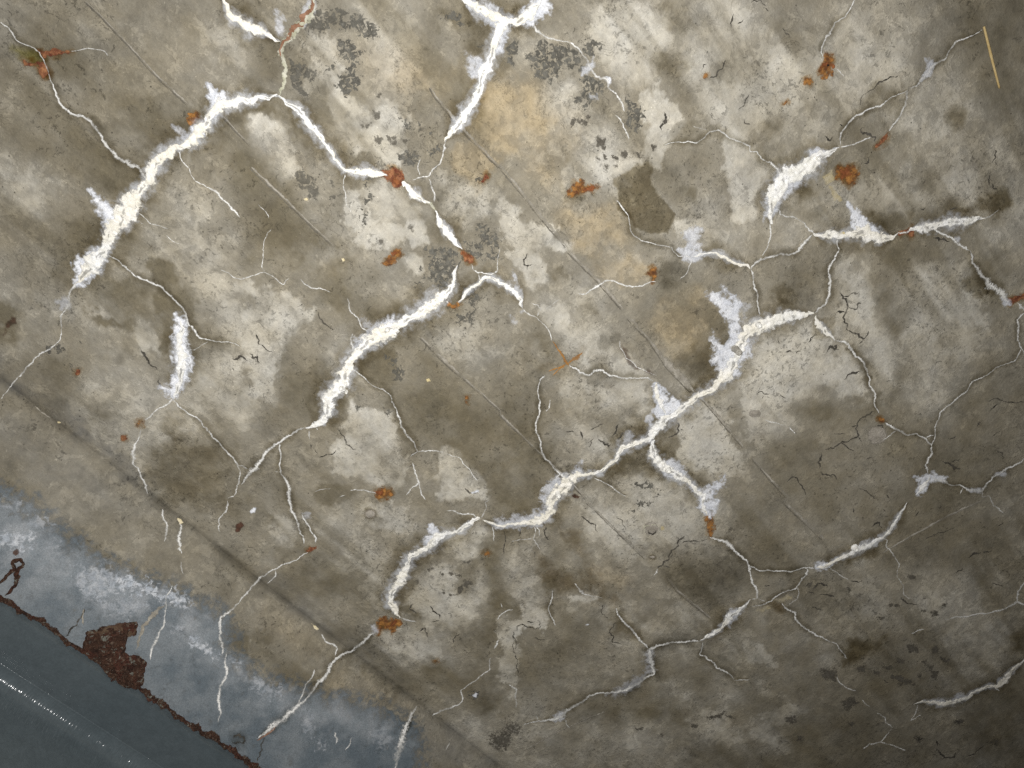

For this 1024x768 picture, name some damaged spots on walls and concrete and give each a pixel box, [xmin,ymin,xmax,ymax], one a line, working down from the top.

crack [277,0,315,96]
corrosion [803,53,835,85]
corrosion [381,163,404,188]
corrosion [566,178,599,197]
water stain [49,76,552,529]
water stain [386,0,985,622]
crack [786,208,1024,538]
water stain [0,530,35,552]
corrosion [0,549,260,768]
water stain [113,575,190,660]
crack [217,445,317,720]
crack [257,633,374,761]